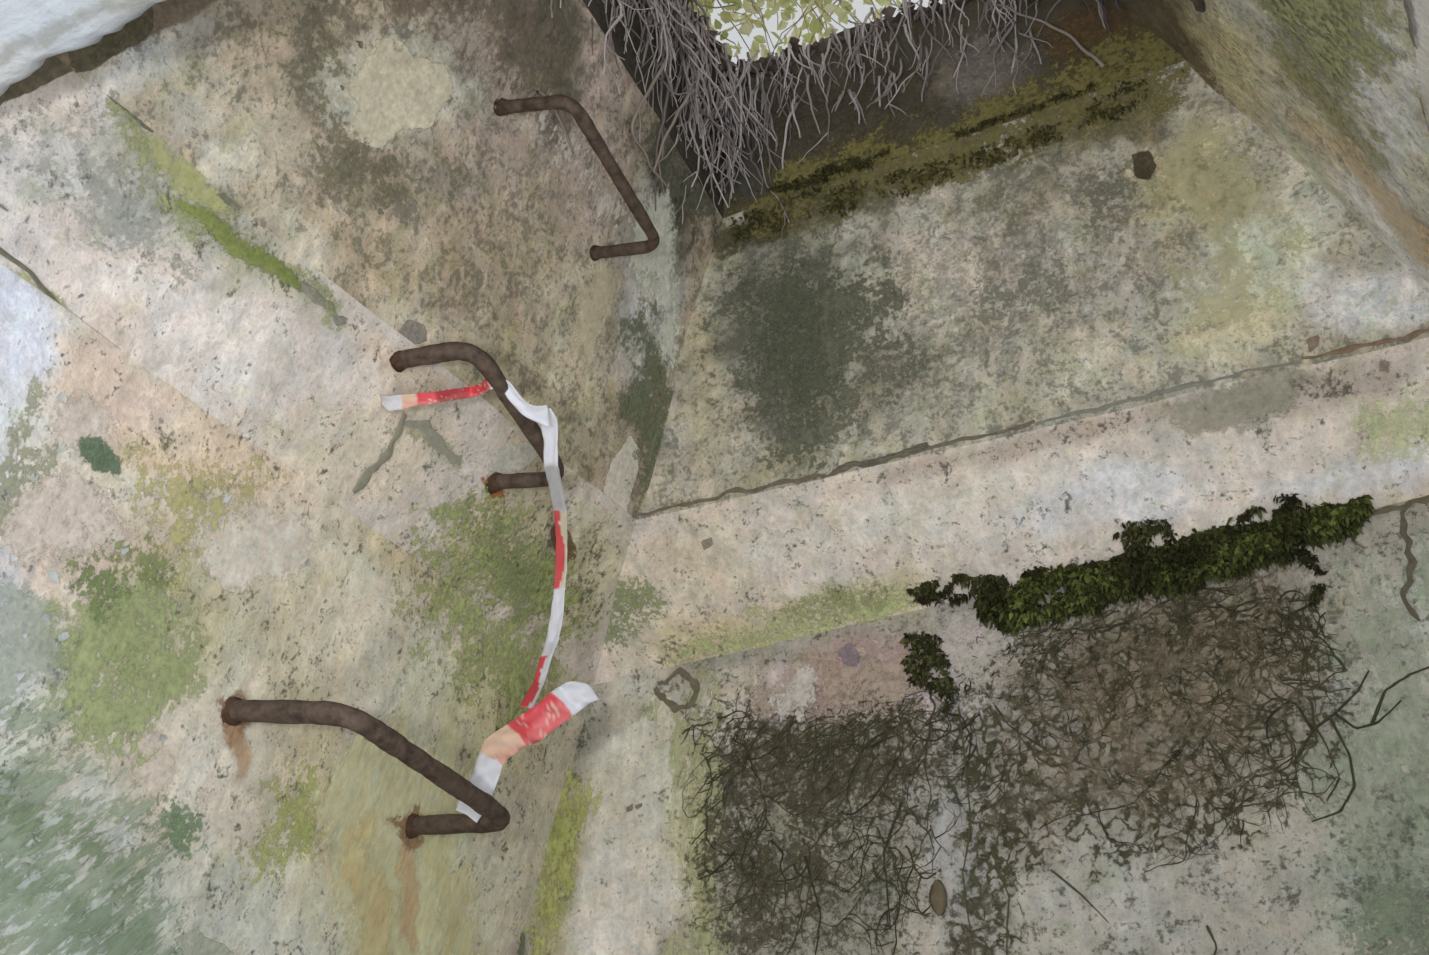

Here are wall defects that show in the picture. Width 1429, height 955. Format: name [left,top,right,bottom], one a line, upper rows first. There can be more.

crack [1403,0,1418,49]
crack [1419,97,1429,131]
damp [614,113,942,484]
crack [1369,495,1429,621]
rust [219,691,250,777]
rust [387,805,424,948]